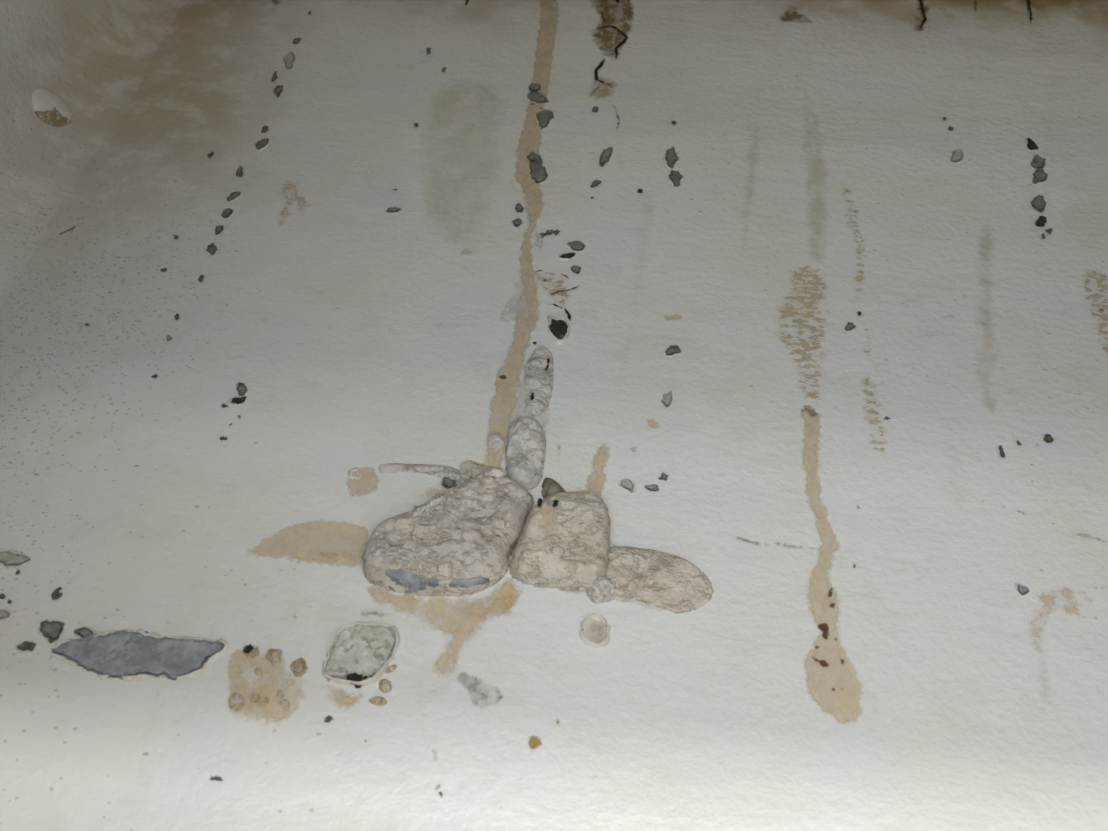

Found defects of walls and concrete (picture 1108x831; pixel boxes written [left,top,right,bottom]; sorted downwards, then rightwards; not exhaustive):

water stain [250,0,714,613]
water stain [781,268,825,362]
water stain [802,374,860,723]
peeling [15,619,230,681]
spalling [322,621,400,706]